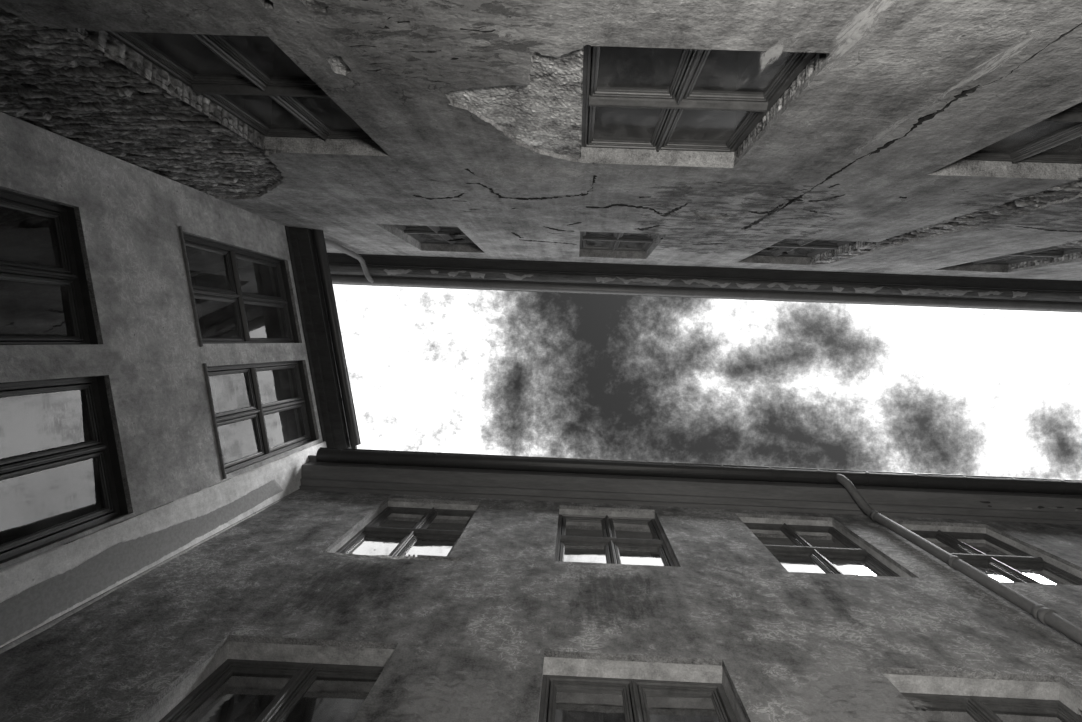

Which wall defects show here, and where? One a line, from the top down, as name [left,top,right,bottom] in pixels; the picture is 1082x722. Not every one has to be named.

flaking render [0,8,287,197]
crack [744,23,1082,229]
crack [413,169,689,245]
flaking render [812,177,1082,264]
crack [1015,225,1082,233]